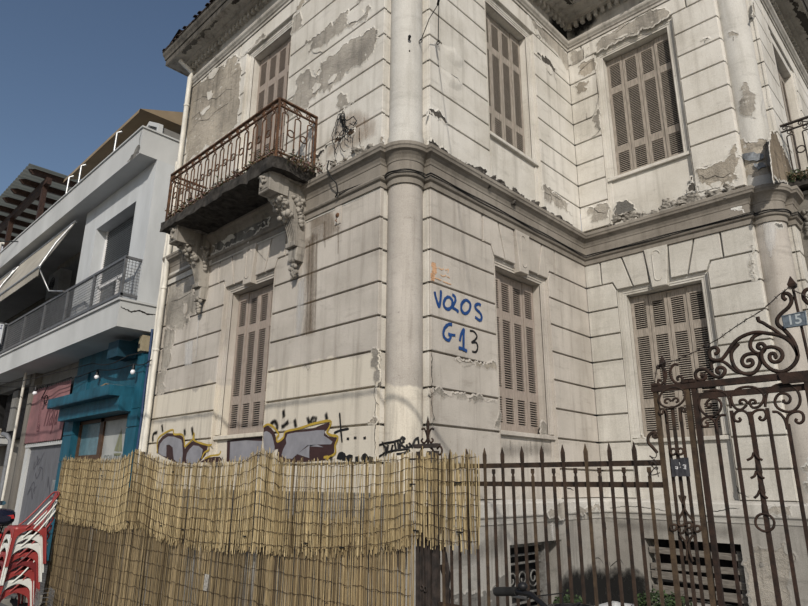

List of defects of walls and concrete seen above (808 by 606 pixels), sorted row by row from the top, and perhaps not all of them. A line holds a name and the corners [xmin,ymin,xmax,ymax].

flaking render [185,32,267,164]
flaking render [286,0,379,120]
flaking render [523,0,671,136]
flaking render [738,81,757,119]
spalling [785,0,808,41]
flaking render [586,130,792,227]